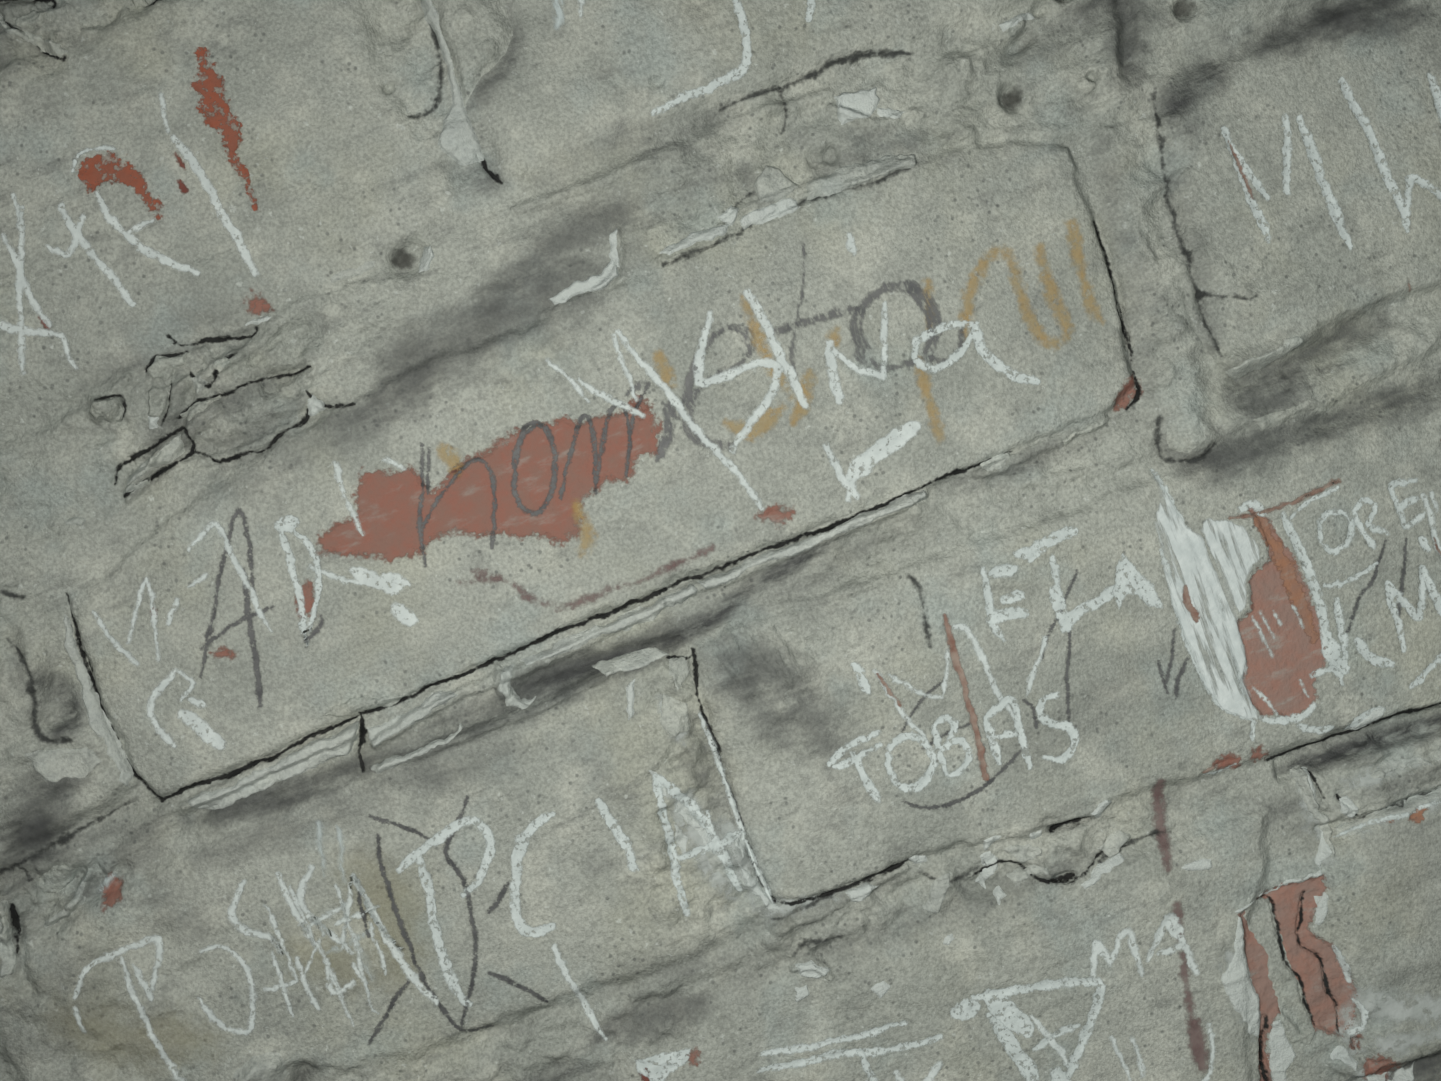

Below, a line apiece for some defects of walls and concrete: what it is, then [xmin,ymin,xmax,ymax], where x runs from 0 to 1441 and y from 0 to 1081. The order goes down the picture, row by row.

peeling [0,10,68,58]
crack [1153,96,1256,351]
peeling [122,352,232,496]
peeling [308,395,325,416]
spalling [1237,508,1326,717]
crack [0,451,1012,953]
crack [666,648,1160,954]
peeling [1181,859,1212,871]
spalling [1202,746,1269,775]
spalling [1221,765,1441,1081]
crack [1266,702,1441,817]
peeling [1347,706,1386,730]